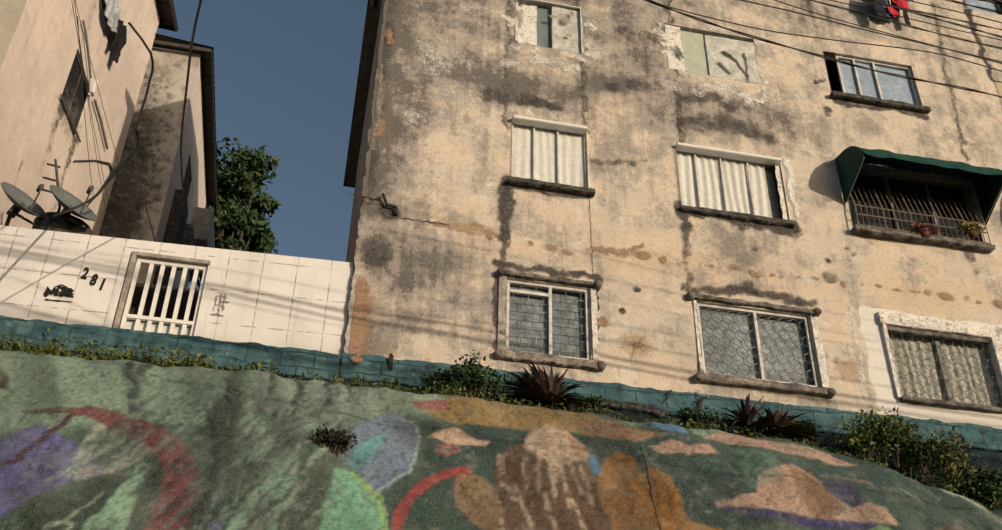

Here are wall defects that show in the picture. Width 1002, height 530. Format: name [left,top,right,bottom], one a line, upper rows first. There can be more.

peeling [500,0,602,73]
leakage [606,79,640,92]
peeling [649,23,684,59]
peeling [693,51,771,104]
leakage [933,4,969,160]
leakage [963,0,995,82]
leakage [99,67,170,240]
leakage [492,175,604,349]
leakage [674,200,817,307]